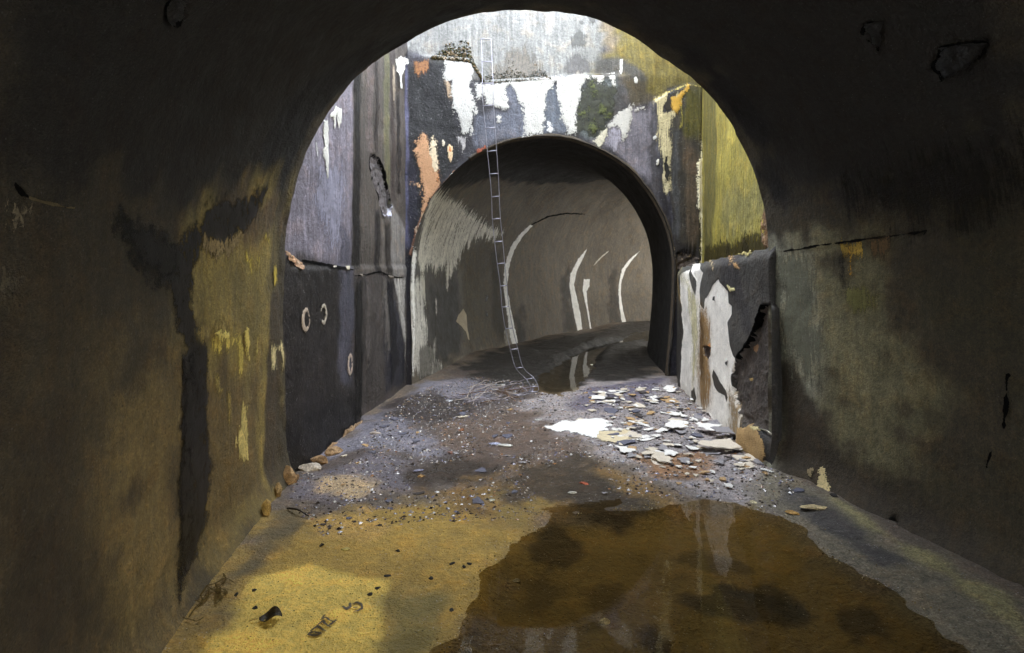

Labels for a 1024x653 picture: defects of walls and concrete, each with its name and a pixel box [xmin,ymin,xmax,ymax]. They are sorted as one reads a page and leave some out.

leakage [442,60,616,153]
spalling [368,154,393,217]
corrosion [411,133,453,217]
leakage [696,141,767,263]
crack [783,230,927,252]
leakage [112,184,268,601]
flaking render [585,252,774,488]
crack [1002,373,1011,429]